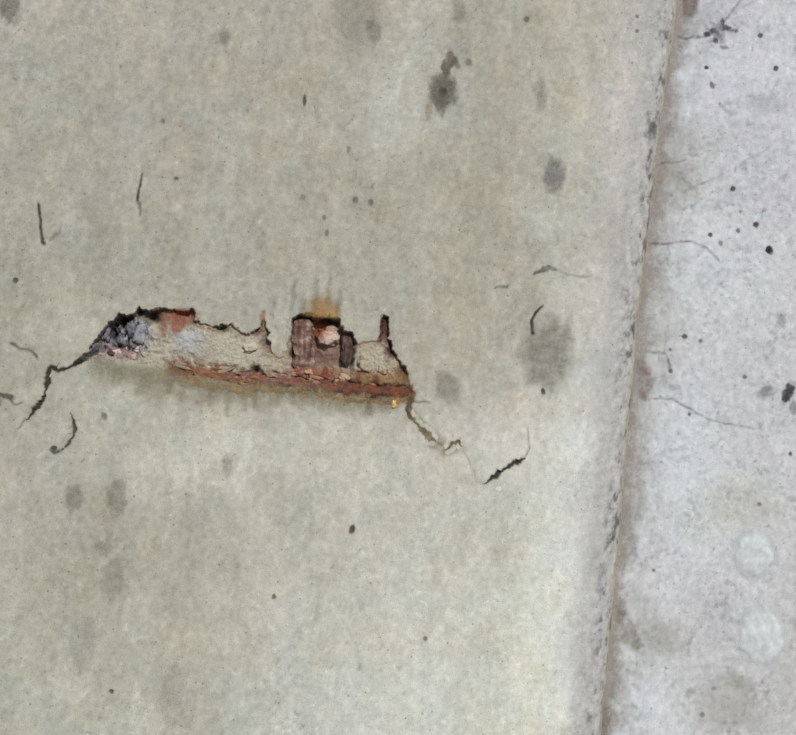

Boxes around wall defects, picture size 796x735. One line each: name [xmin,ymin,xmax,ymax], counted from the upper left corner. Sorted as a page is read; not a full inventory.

water stain [428,52,457,109]
corrosion [310,299,337,317]
crack [0,343,99,456]
spalling [79,303,420,409]
corrosion [99,358,412,408]
crack [398,397,466,456]
crack [480,452,528,489]